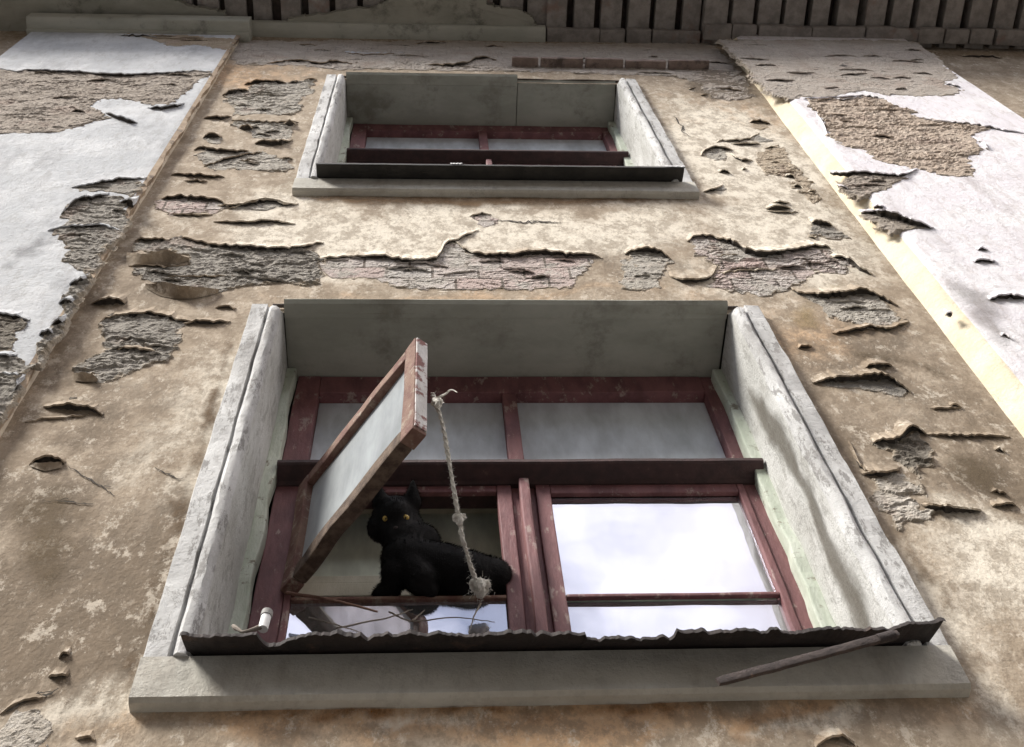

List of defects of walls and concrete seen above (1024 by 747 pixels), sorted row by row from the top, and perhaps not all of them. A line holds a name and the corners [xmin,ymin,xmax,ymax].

flaking render [0,68,216,134]
flaking render [119,33,1024,237]
flaking render [0,177,603,426]
flaking render [618,200,909,334]
flaking render [971,246,996,263]
flaking render [985,291,1024,301]
flaking render [861,357,892,368]
flaking render [848,418,1016,532]